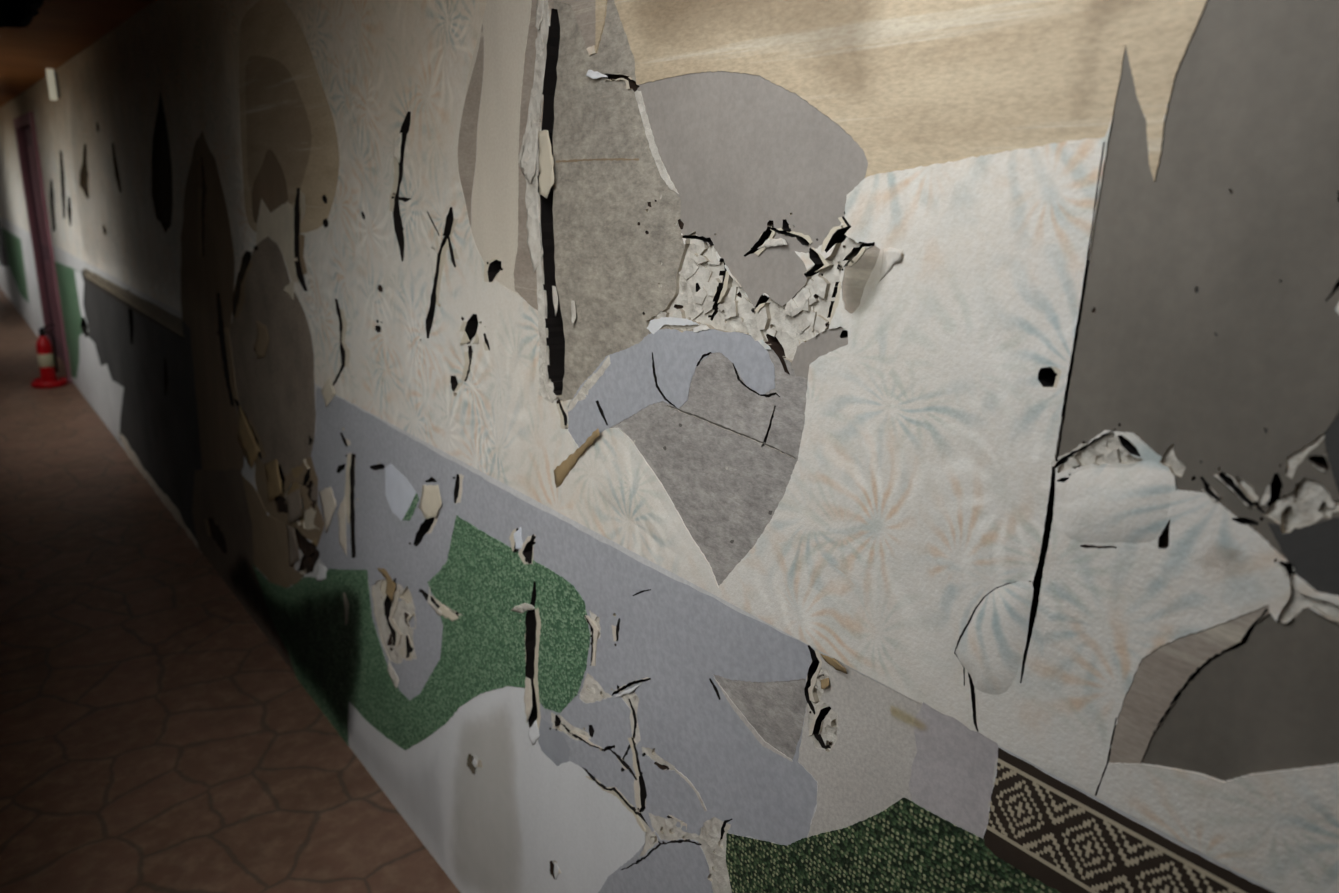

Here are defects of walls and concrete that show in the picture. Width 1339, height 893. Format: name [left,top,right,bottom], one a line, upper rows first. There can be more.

crack [389,111,459,341]
peeling [81,0,999,893]
crack [518,0,608,429]
peeling [458,0,1339,781]
crack [954,142,1140,732]
crack [1094,718,1117,796]